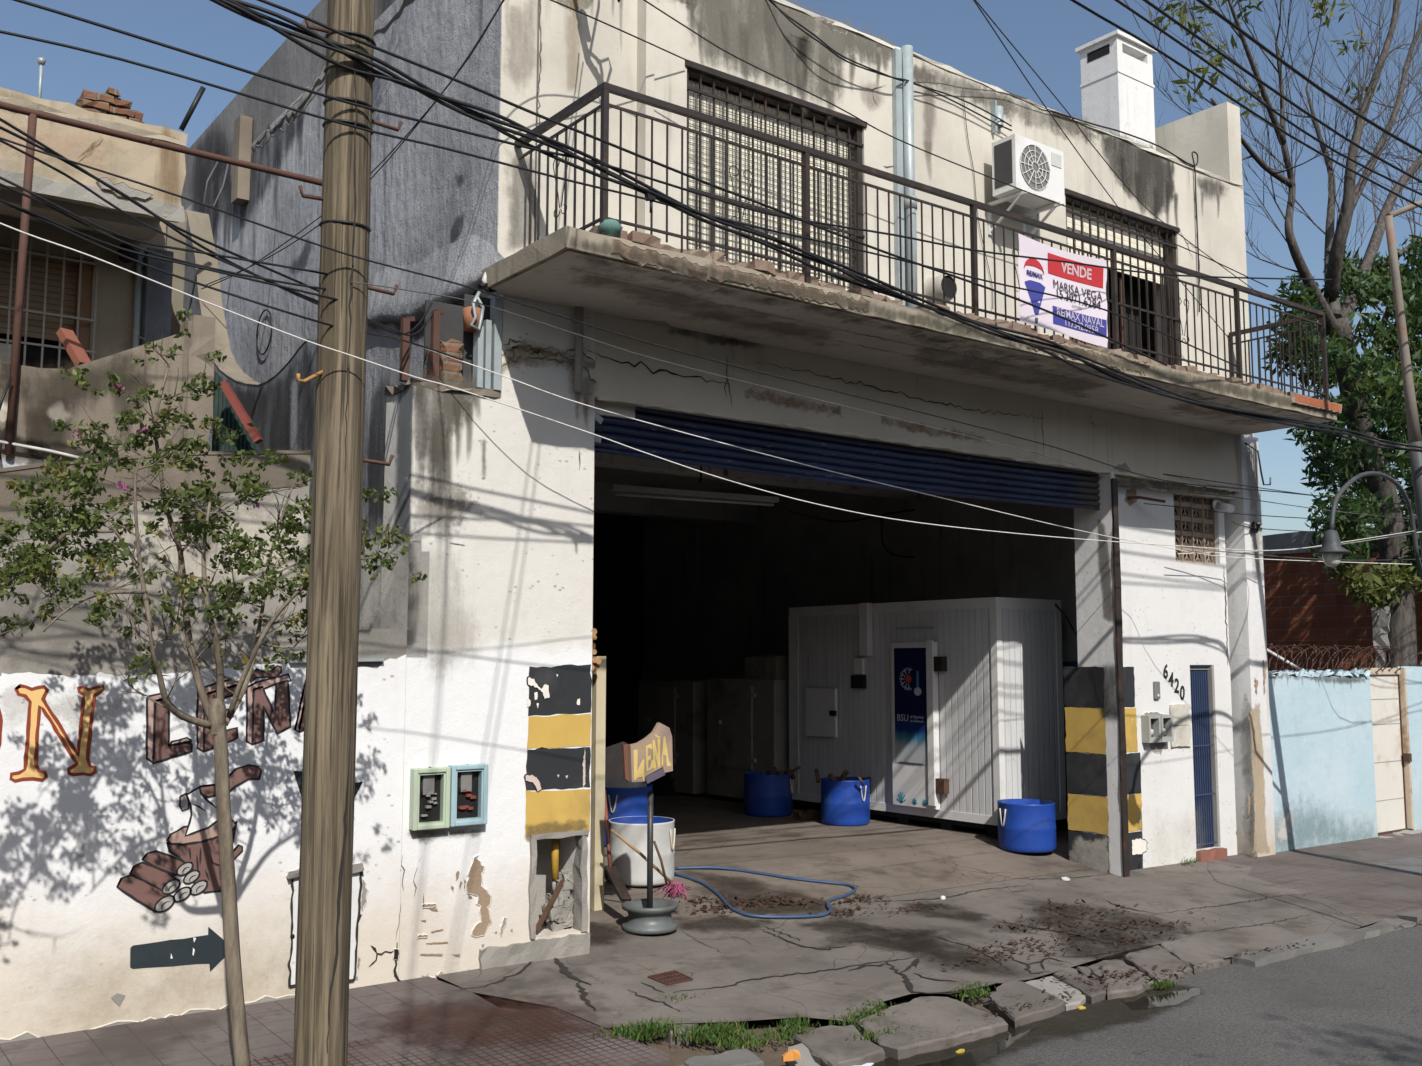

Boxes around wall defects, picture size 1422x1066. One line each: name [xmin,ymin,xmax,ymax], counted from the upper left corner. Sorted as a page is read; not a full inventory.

damp [682,0,894,128]
damp [913,66,1180,233]
damp [1200,180,1222,201]
damp [451,216,463,243]
damp [453,287,490,306]
damp [398,319,424,349]
damp [368,376,485,555]
peeling [526,674,558,707]
peeling [524,774,542,792]
peeling [451,854,513,947]